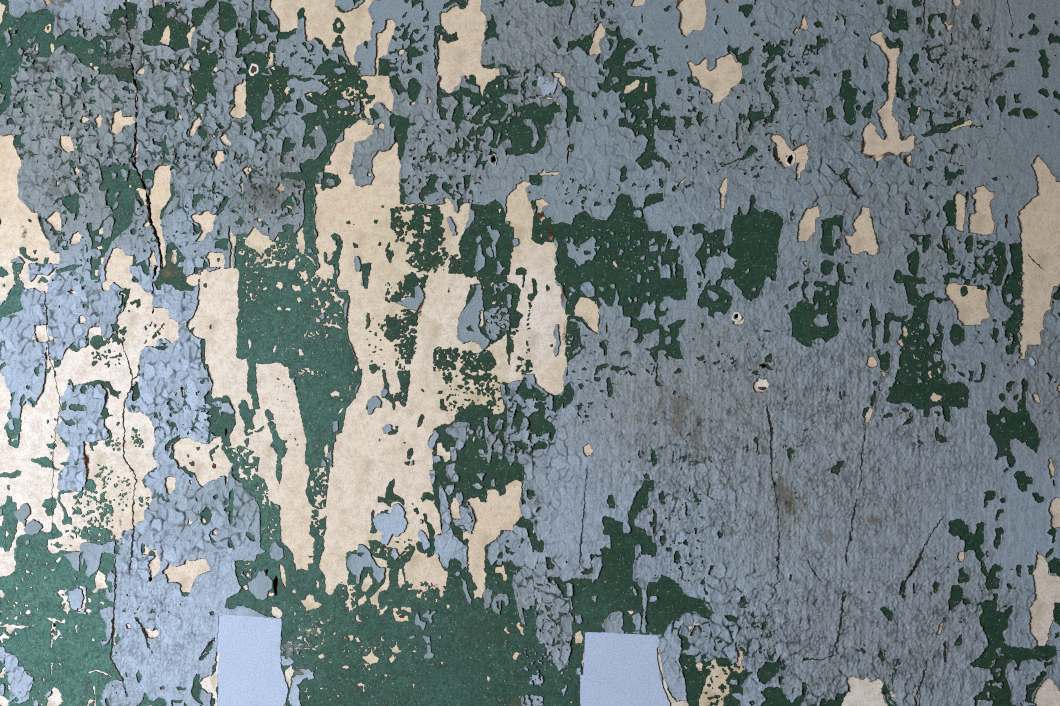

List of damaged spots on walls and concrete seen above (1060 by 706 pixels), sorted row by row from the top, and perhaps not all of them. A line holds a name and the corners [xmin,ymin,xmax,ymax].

peeling [554,0,829,181]
peeling [673,195,883,348]
flaking render [824,0,1060,447]
crack [44,299,61,535]
flaking render [142,543,211,602]
peeling [138,638,220,706]
peeling [198,489,236,546]
peeling [579,364,636,399]
flaking render [696,330,788,434]
crack [766,405,780,579]
crack [808,601,843,660]
peeling [936,379,1060,706]